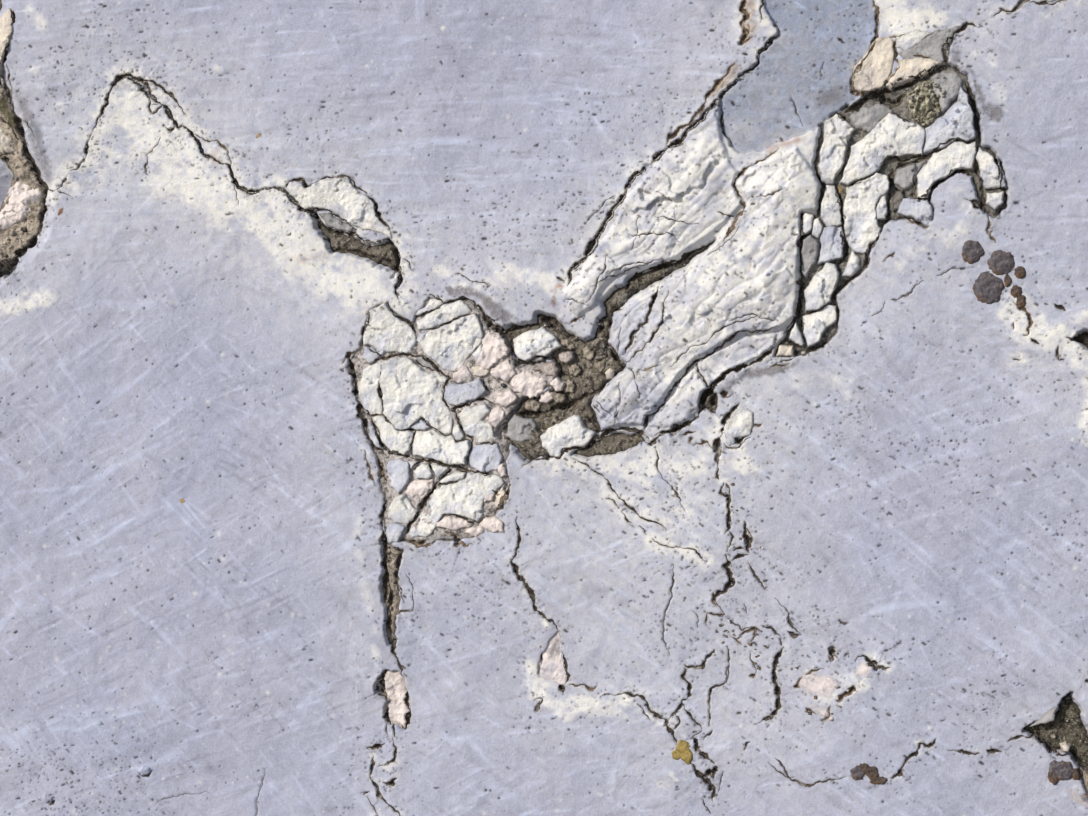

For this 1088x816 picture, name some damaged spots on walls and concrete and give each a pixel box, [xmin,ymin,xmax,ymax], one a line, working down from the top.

spalling [0,0,49,277]
crack [48,73,416,332]
spalling [719,0,1008,357]
crack [429,273,536,361]
peeling [347,241,714,548]
peeling [658,388,762,449]
crack [363,724,400,816]
crack [365,452,414,675]
spalling [376,669,411,729]
crack [510,404,801,814]
crack [892,735,1024,778]
spalling [1024,693,1088,792]